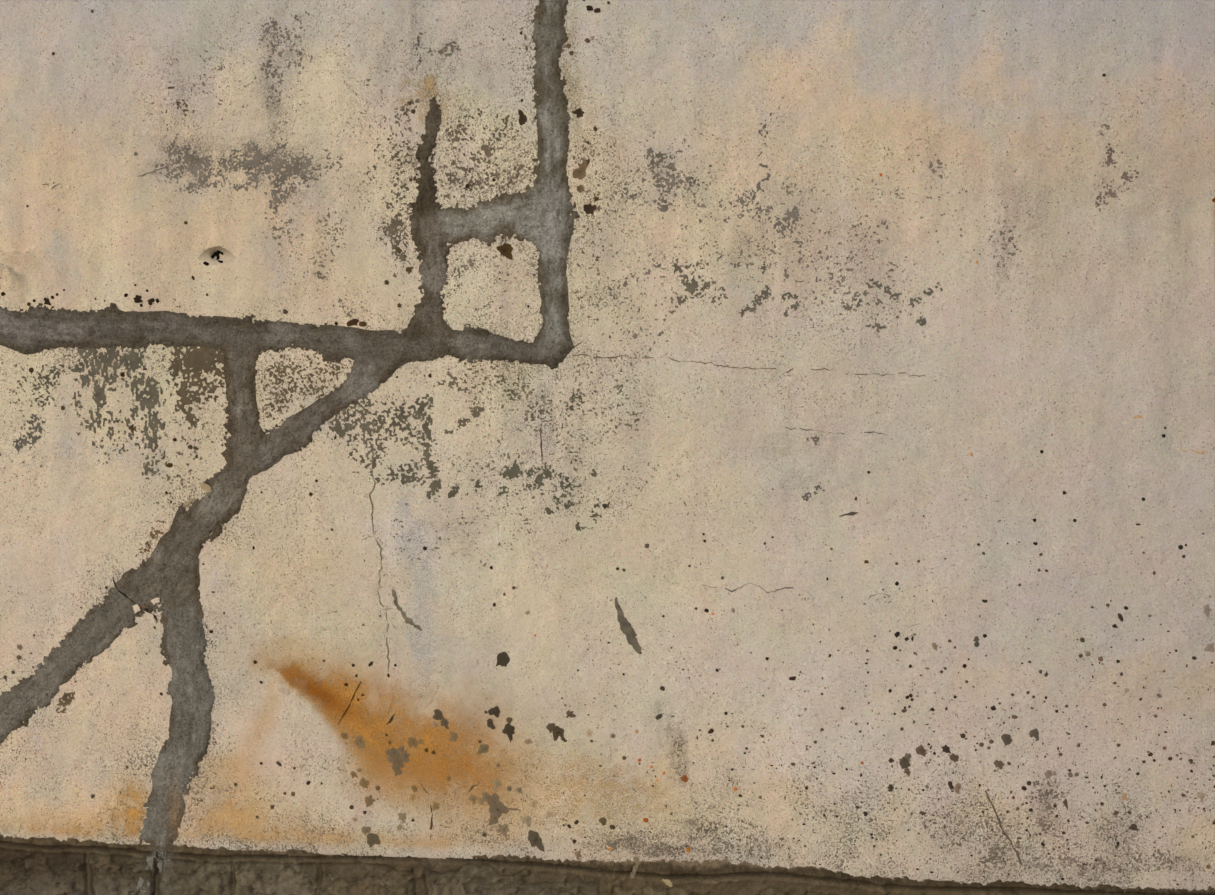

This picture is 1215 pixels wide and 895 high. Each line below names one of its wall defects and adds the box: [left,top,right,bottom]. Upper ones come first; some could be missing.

peeling [382,20,459,77]
peeling [153,0,420,317]
peeling [963,194,1031,274]
peeling [327,107,968,569]
peeling [0,346,225,504]
crack [112,578,158,623]
peeling [135,520,164,557]
crack [363,445,392,672]
corrosion [279,663,494,796]